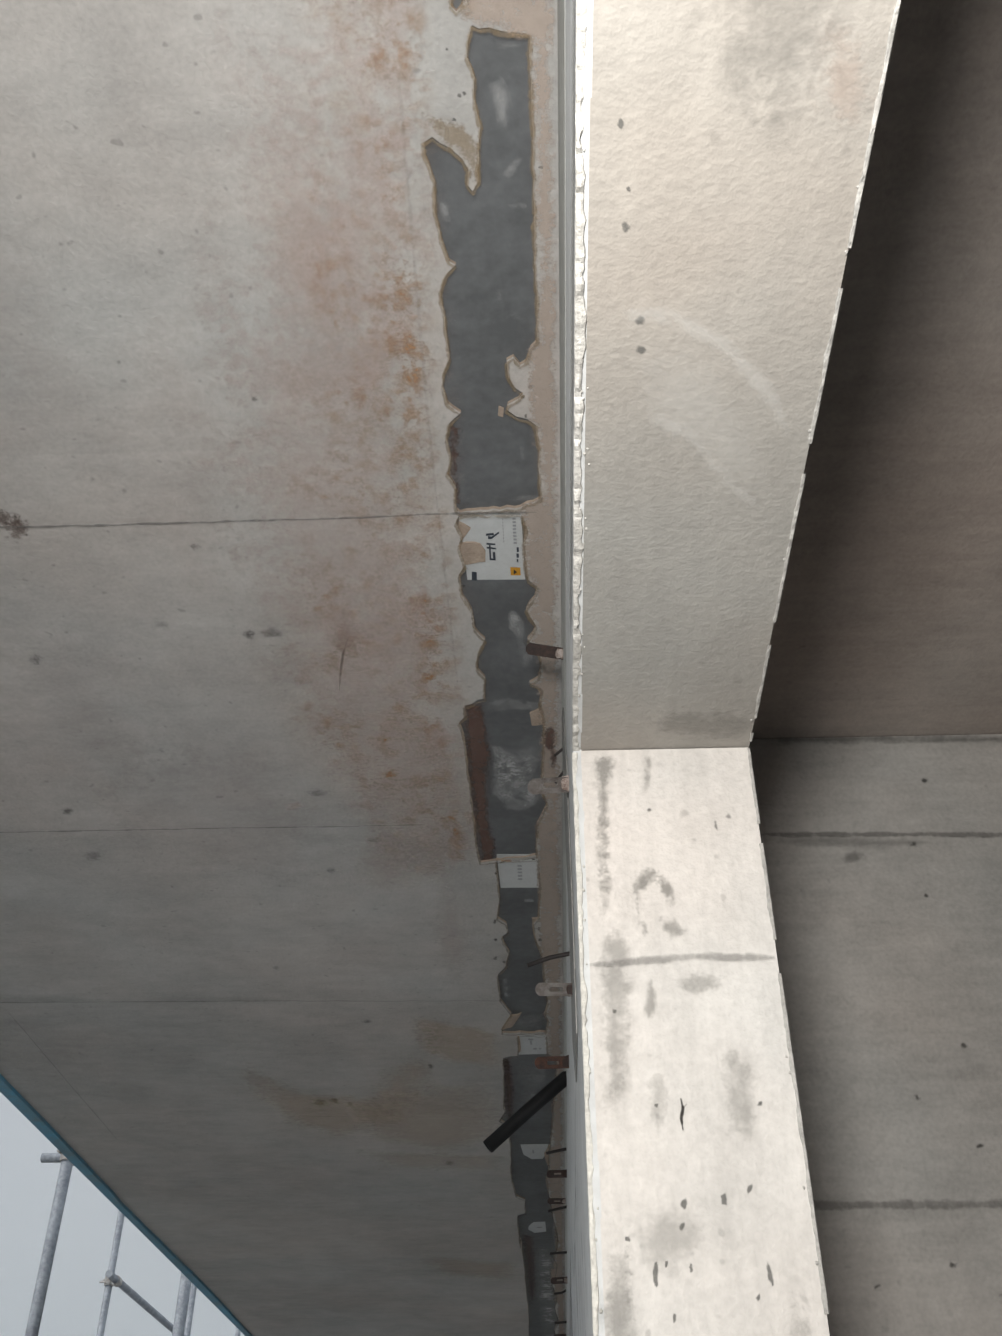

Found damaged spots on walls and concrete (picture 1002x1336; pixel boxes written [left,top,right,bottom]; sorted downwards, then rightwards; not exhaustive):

peeling [451,0,463,11]
peeling [424,25,559,1336]